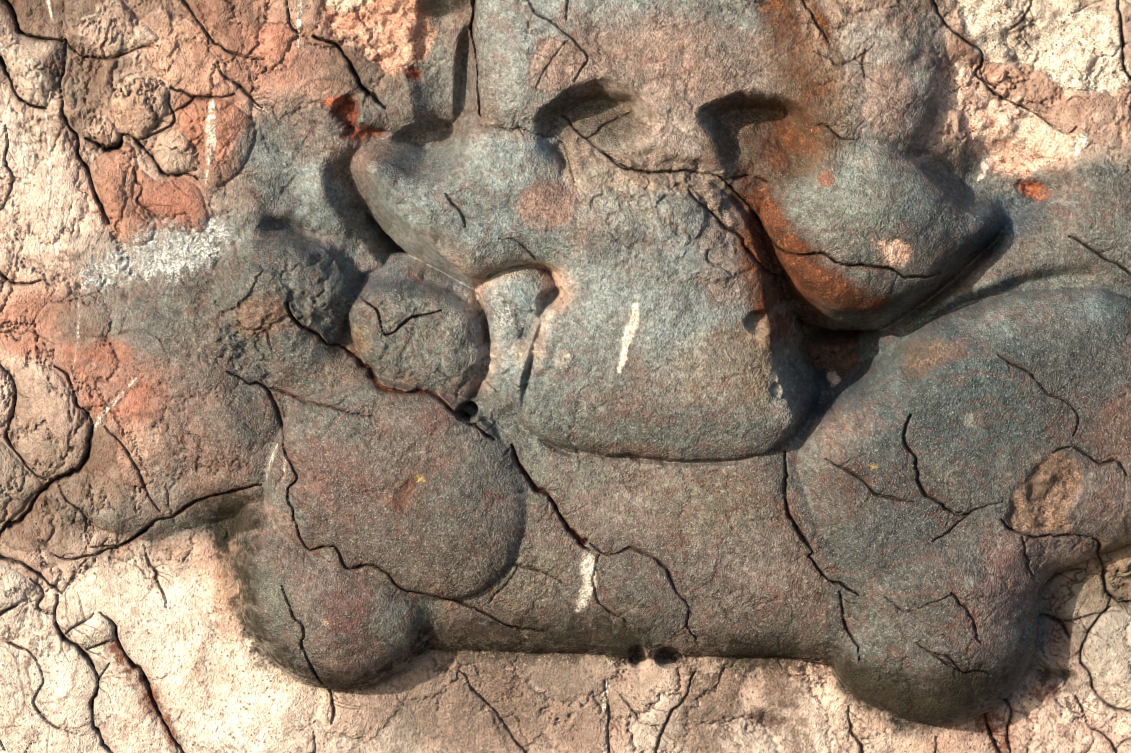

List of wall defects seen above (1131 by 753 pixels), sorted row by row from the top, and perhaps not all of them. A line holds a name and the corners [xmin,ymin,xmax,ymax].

crack [318,38,379,102]
crack [937,11,1041,117]
crack [62,69,182,224]
crack [624,168,886,274]
crack [347,350,488,435]
crack [3,399,93,530]
crack [313,546,519,628]
crack [514,449,587,549]
crack [784,488,841,583]
spalling [1005,453,1081,533]
crack [55,608,111,751]
crack [113,622,169,728]